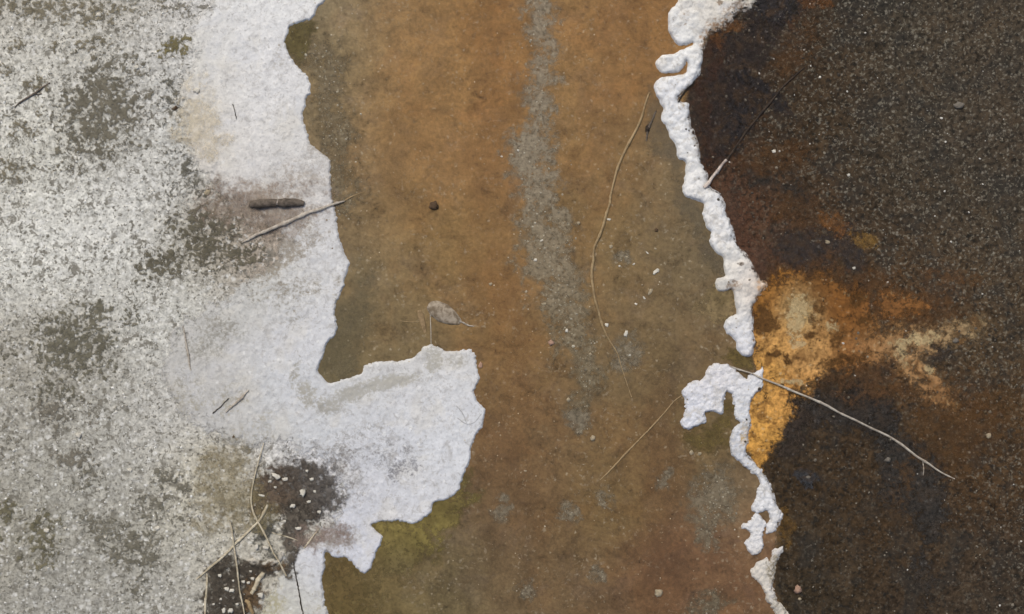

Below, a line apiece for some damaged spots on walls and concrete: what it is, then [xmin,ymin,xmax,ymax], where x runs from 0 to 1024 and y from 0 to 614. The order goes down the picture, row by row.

spalling [294,27,365,229]
damp [160,0,803,614]
spalling [498,0,644,436]
rust [746,259,987,468]